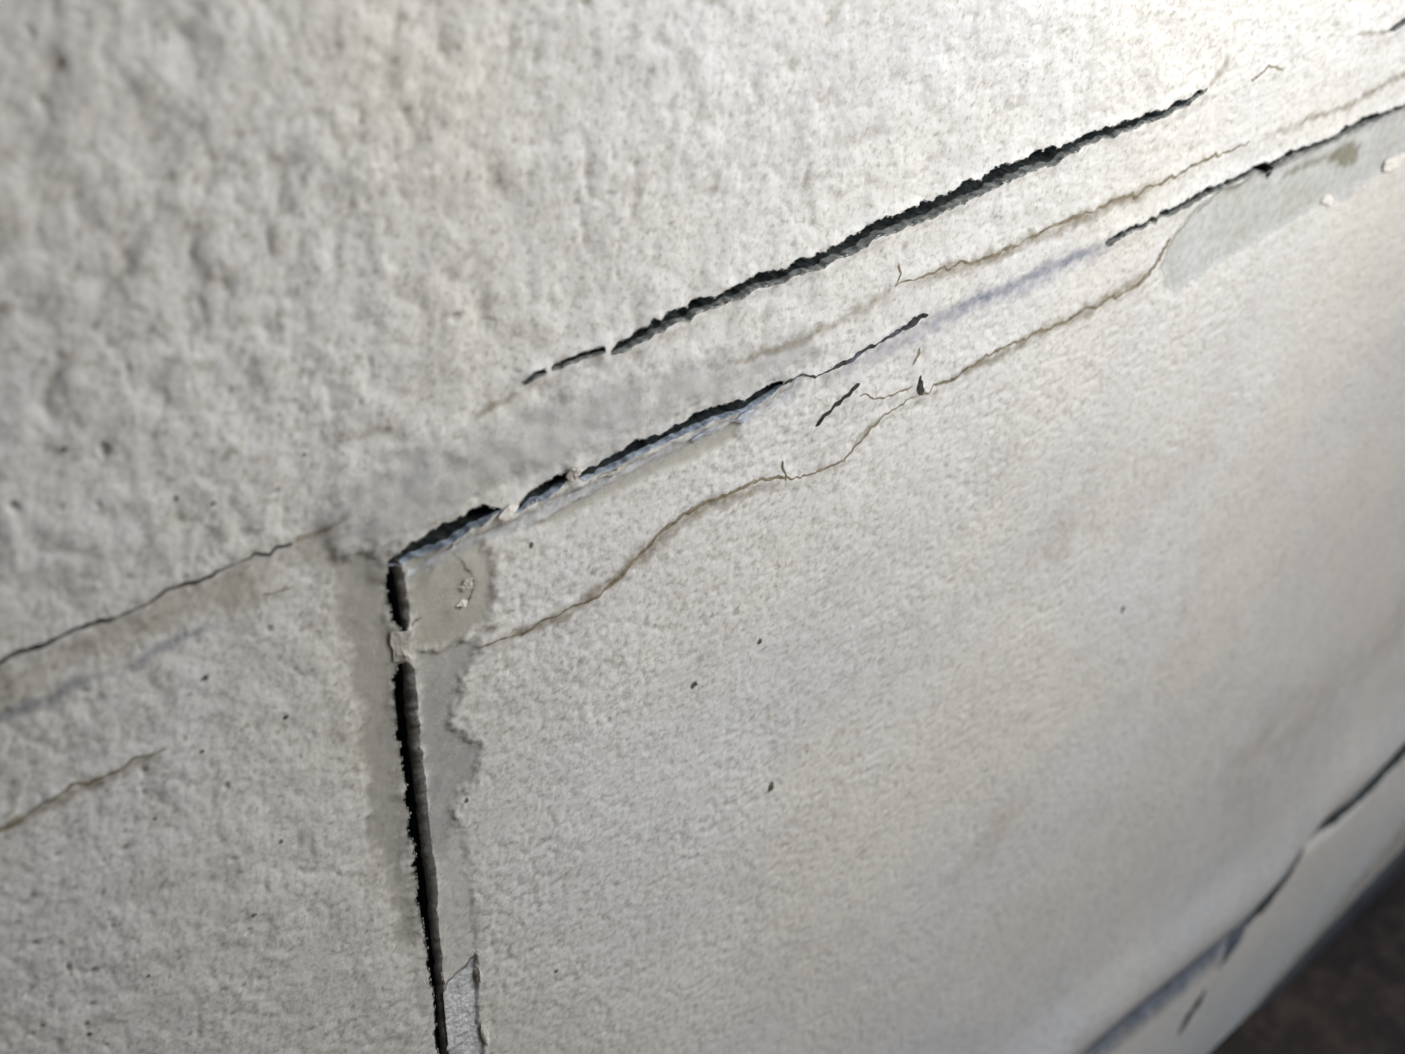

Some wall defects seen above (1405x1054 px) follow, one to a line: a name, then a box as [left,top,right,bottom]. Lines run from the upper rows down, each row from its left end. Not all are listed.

crack [1252,64,1283,82]
crack [1384,18,1405,33]
peeling [1161,108,1405,293]
crack [0,522,341,665]
peeling [406,541,491,647]
crack [383,76,1405,1054]
peeling [327,555,415,940]
peeling [473,950,484,983]